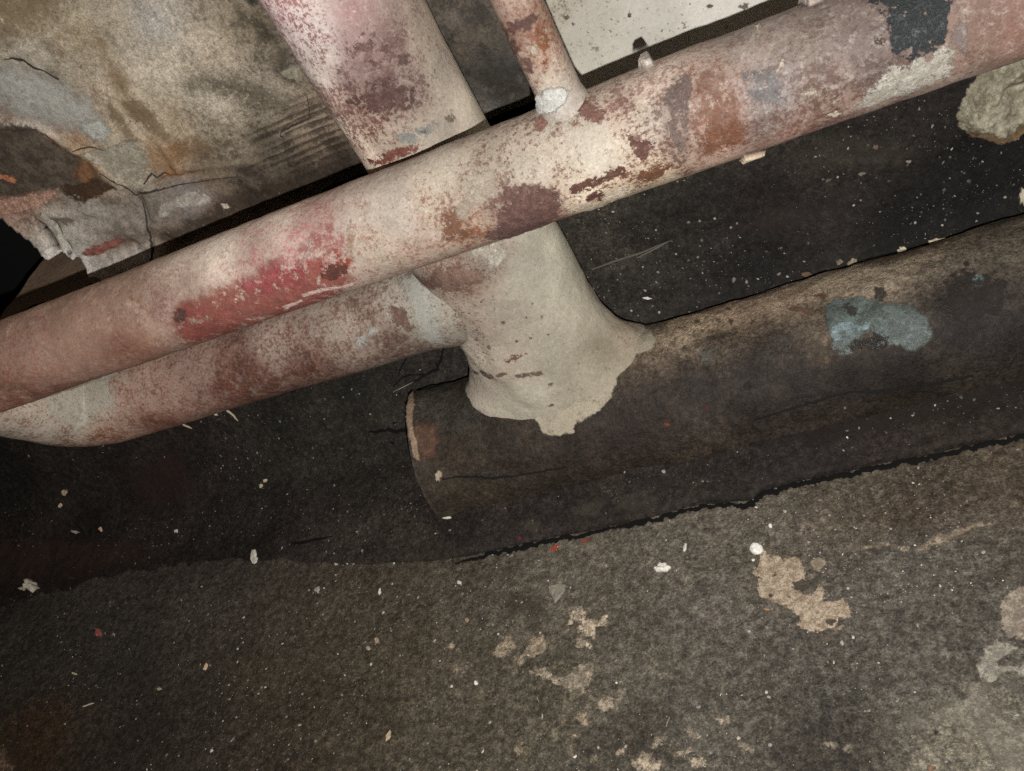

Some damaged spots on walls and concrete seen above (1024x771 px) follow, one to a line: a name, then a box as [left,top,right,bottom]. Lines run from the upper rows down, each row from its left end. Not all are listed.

crack [72,146,248,261]
corrosion [346,32,416,122]
corrosion [367,130,426,166]
corrosion [502,14,550,84]
corrosion [441,135,673,241]
corrosion [697,72,746,156]
corrosion [319,264,348,281]
corrosion [174,309,187,323]
hole [849,332,889,351]
crack [442,433,1024,565]
peeling [753,550,853,643]